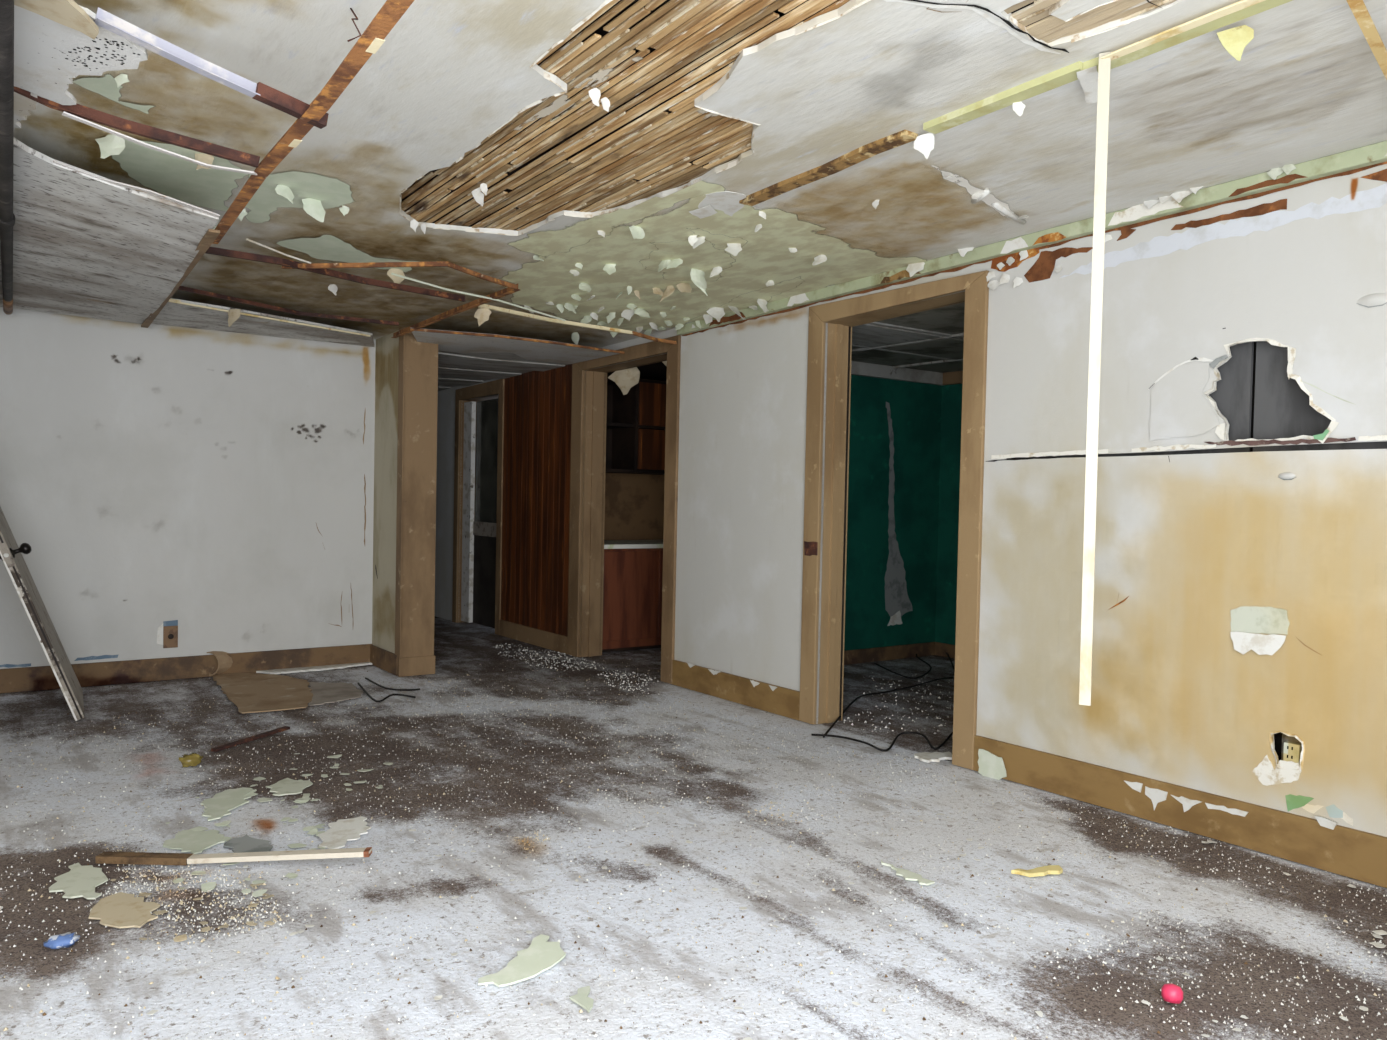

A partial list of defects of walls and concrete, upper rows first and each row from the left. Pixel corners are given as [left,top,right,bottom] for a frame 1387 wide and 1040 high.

peeling [365,38,385,54]
crack [884,0,1069,54]
spalling [1004,0,1177,43]
peeling [73,74,155,114]
spalling [399,0,927,345]
peeling [95,134,420,284]
hole [1006,338,1387,459]
peeling [1230,606,1321,655]
peeling [1124,780,1248,817]
spalling [1252,731,1353,830]